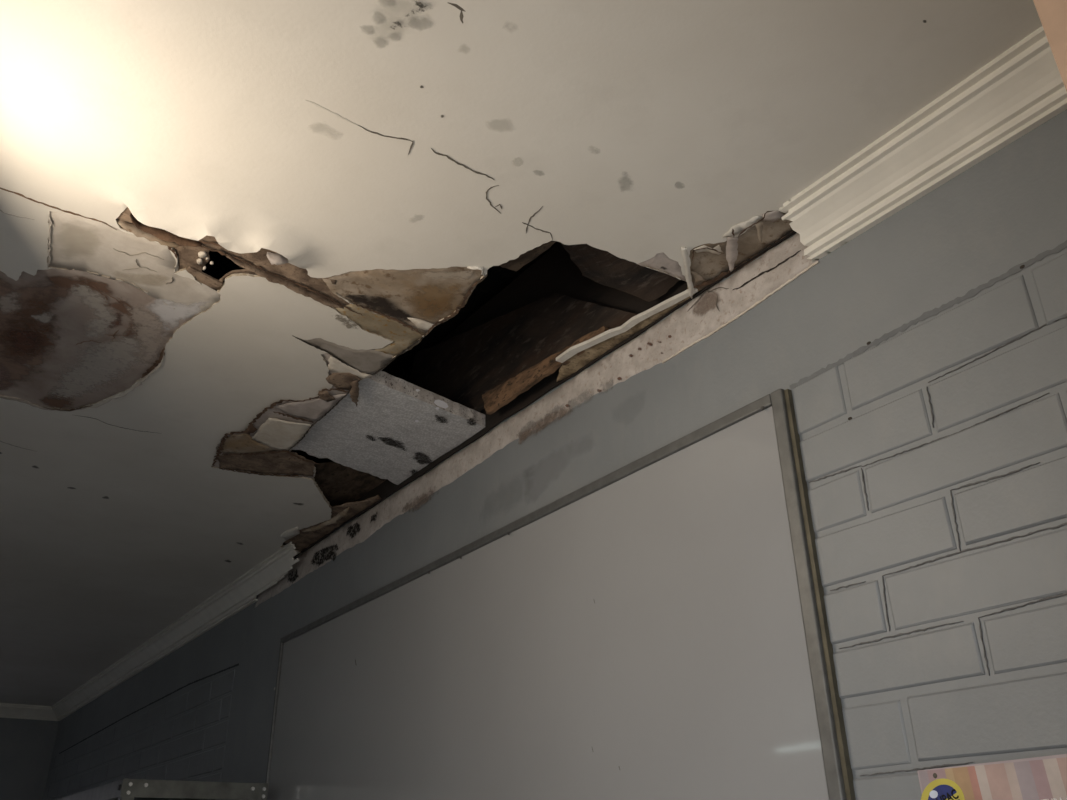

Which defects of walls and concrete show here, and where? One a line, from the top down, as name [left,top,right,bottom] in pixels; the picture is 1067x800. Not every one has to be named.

crack [0,188,116,230]
crack [306,100,553,241]
peeling [0,211,221,412]
flaking render [254,233,819,608]